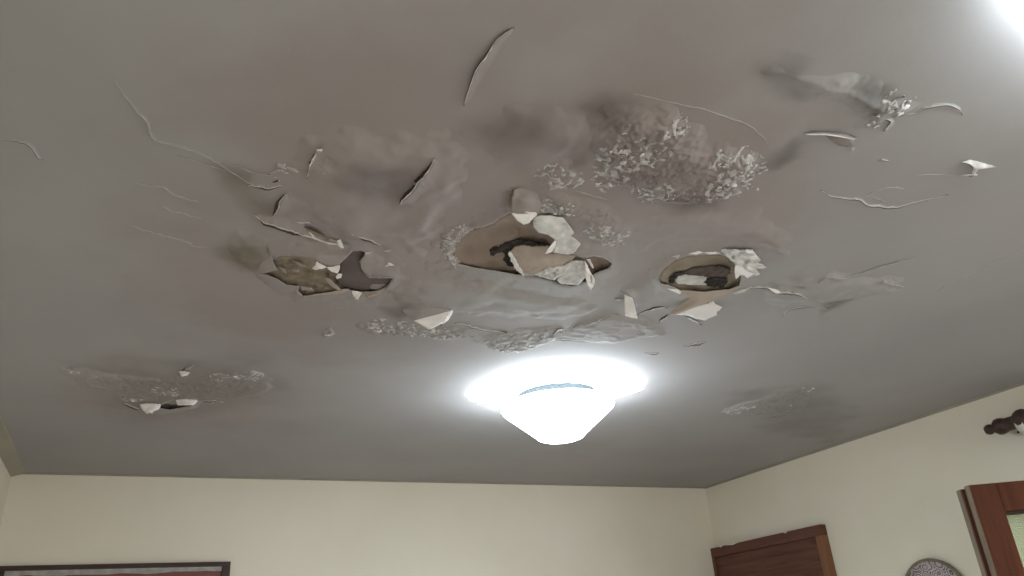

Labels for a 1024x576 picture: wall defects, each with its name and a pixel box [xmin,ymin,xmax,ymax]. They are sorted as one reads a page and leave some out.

crack [463,27,514,106]
crack [114,78,383,248]
peeling [803,131,857,152]
crack [820,159,947,209]
peeling [923,160,995,177]
flaking render [255,234,410,309]
flaking render [425,188,767,325]
flaking render [122,397,220,415]